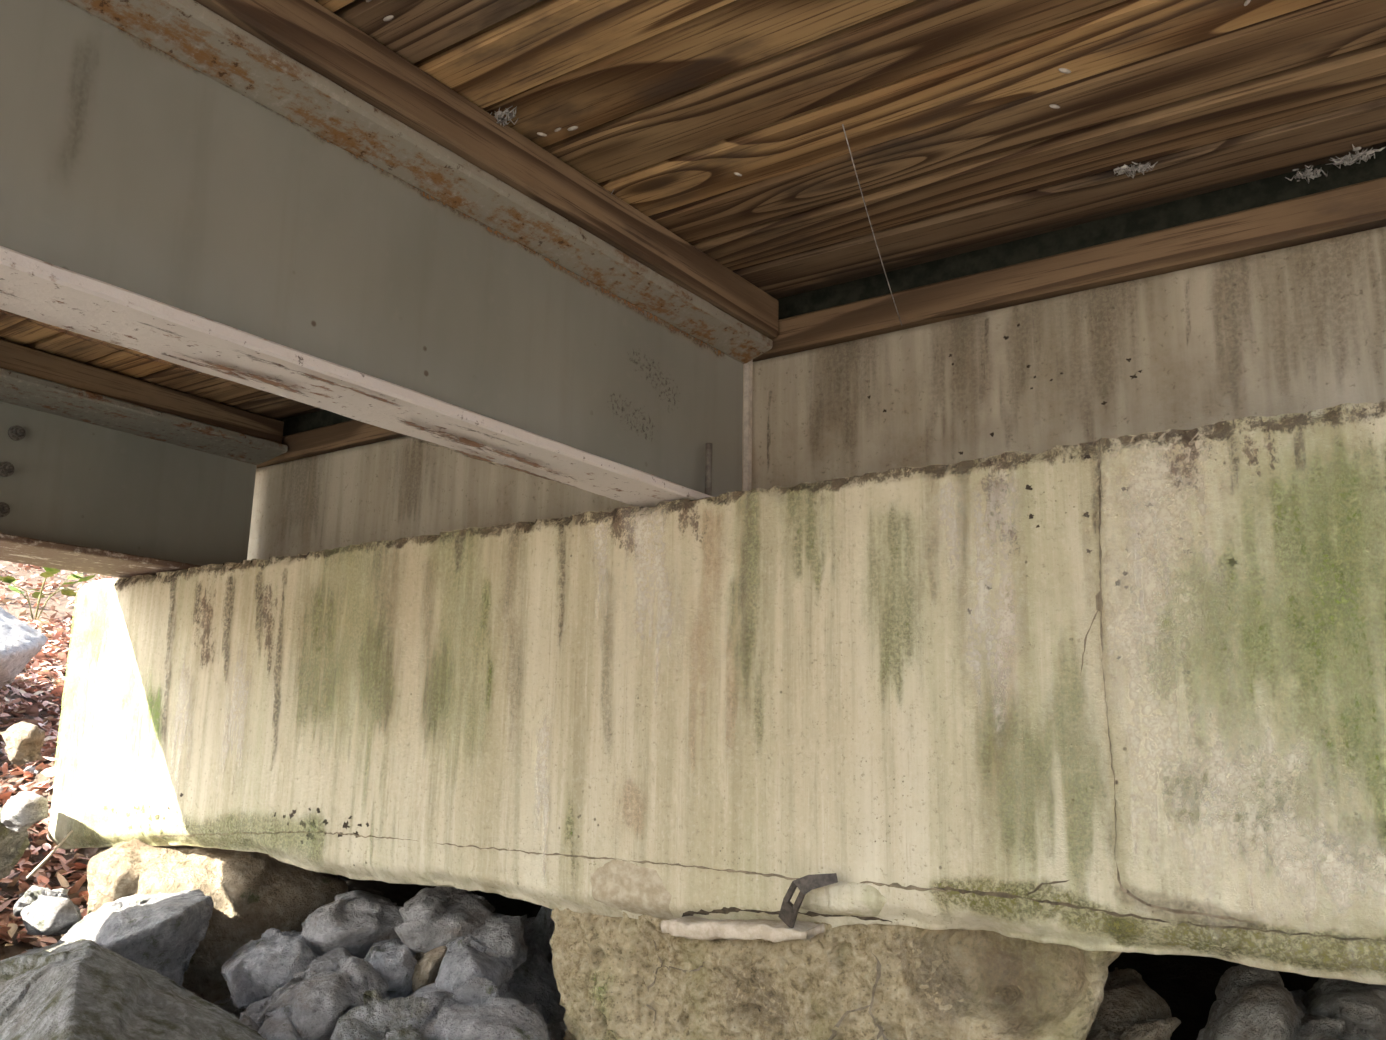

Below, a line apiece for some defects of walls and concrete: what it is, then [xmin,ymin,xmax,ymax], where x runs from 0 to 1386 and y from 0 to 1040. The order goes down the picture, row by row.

corrosion [349,151,724,356]
damp [54,585,112,803]
damp [144,583,188,768]
damp [222,577,246,763]
damp [272,573,286,759]
damp [973,485,1014,683]
damp [1093,428,1386,911]